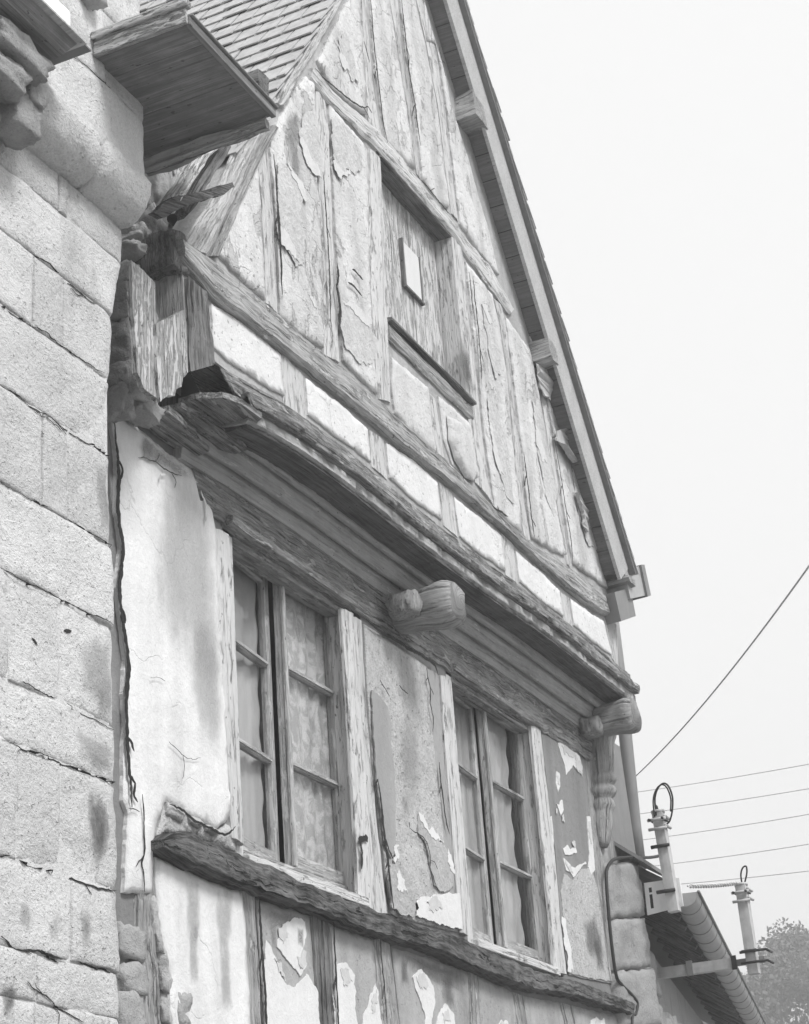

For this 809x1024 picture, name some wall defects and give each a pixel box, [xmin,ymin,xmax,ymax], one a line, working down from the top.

peeling [298,110,363,179]
crack [273,154,283,295]
crack [323,175,363,323]
crack [492,456,536,536]
crack [554,437,573,559]
crack [0,386,182,895]
peeling [371,690,463,929]
peeling [550,742,612,981]
peeling [262,917,320,1024]
peeling [332,962,382,1024]
peeling [412,969,455,1024]